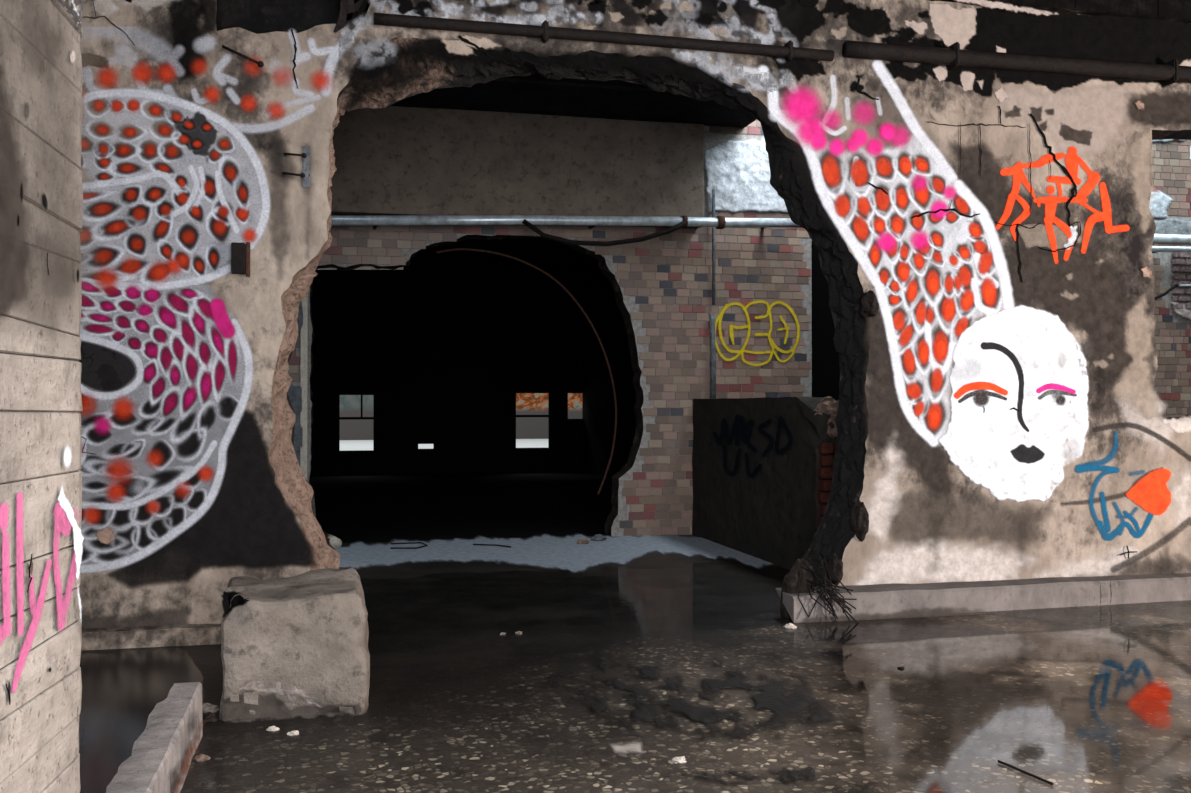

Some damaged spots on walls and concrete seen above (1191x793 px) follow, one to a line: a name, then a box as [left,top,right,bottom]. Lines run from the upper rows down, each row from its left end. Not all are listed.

crack [82,3,135,45]
flaking render [905,0,1058,49]
flaking render [933,65,947,81]
flaking render [961,72,983,91]
flaking render [995,85,1191,235]
crack [911,106,1081,282]
spalling [1064,226,1077,249]
spalling [268,26,870,586]
spalling [1114,297,1191,433]
damp [858,313,1041,585]
damp [1174,474,1191,518]
damp [1041,548,1191,577]